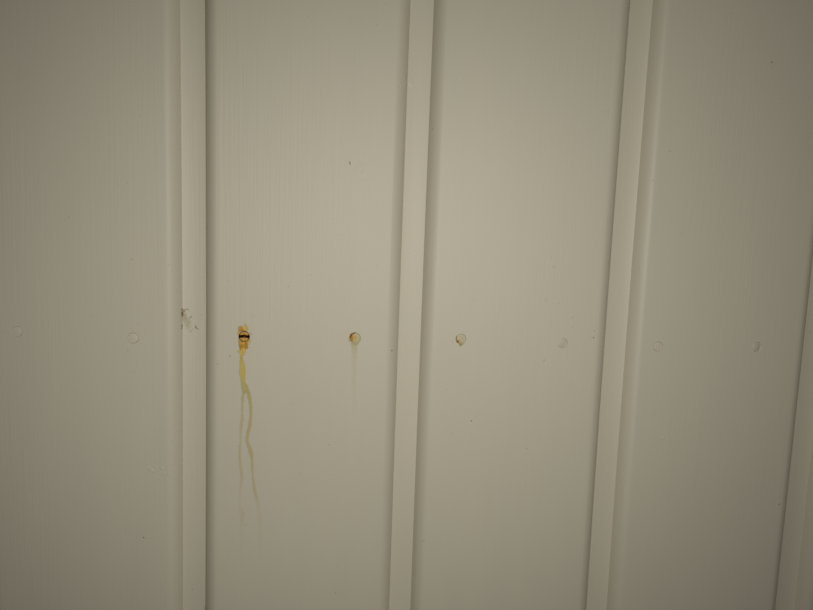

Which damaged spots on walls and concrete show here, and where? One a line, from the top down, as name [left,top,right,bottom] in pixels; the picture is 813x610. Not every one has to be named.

rust [237,325,251,406]